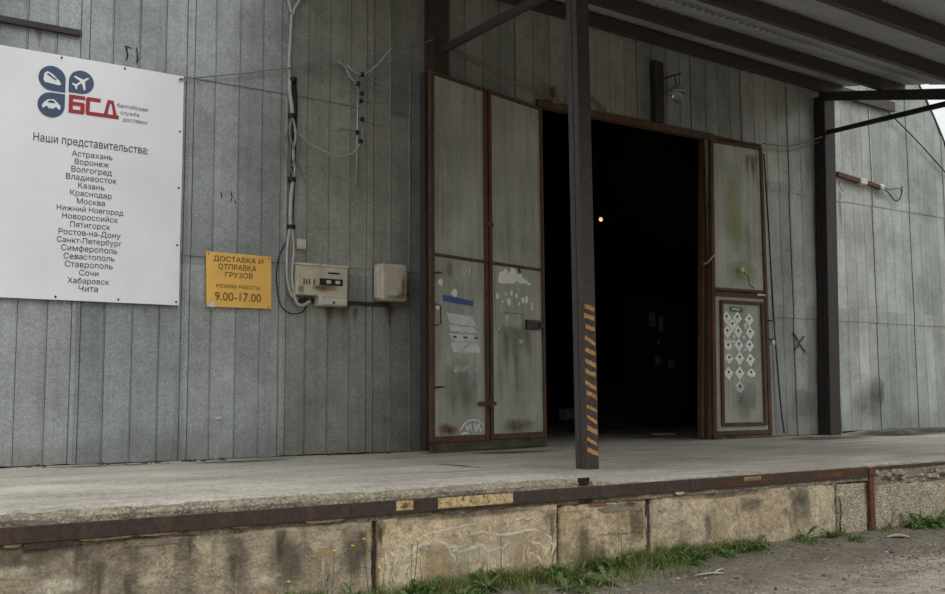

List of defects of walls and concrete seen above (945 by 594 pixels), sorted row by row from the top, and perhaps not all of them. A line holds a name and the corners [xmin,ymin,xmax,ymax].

crack [834,489,842,533]